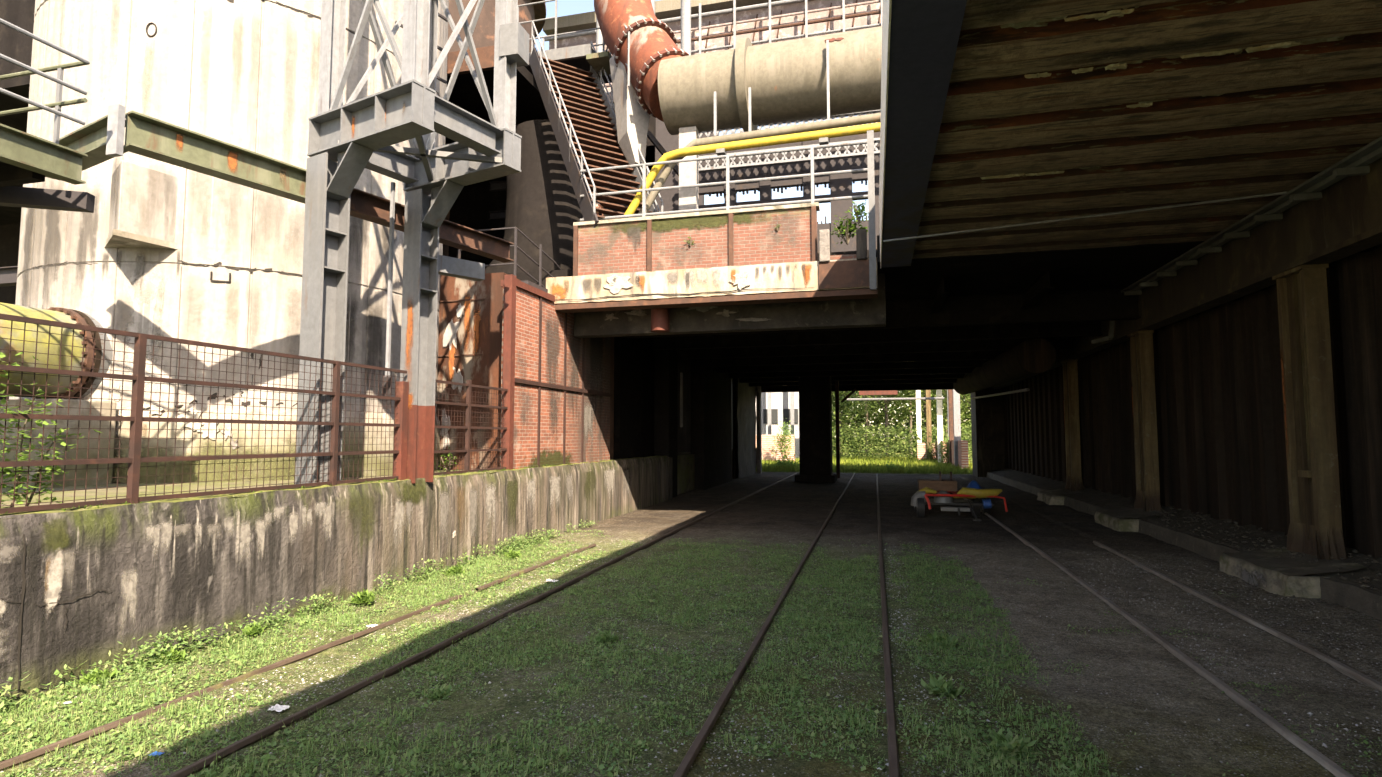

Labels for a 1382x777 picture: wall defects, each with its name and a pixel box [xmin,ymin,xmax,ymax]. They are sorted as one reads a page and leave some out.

peeling [1000,6,1139,29]
peeling [1071,35,1350,74]
corrosion [228,152,238,171]
water stain [79,158,144,287]
water stain [22,208,59,309]
corrosion [551,284,567,299]
corrosion [449,294,480,381]
spalling [0,539,16,563]
peeling [46,550,63,612]
water stain [122,572,137,620]
water stain [146,496,373,556]
water stain [440,469,630,538]